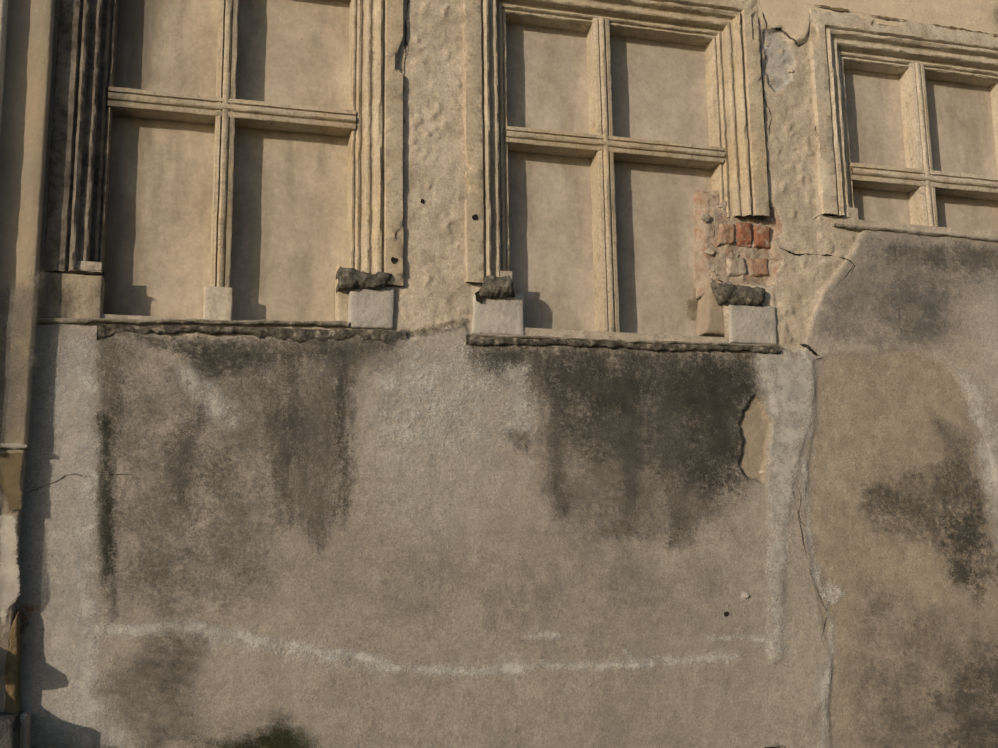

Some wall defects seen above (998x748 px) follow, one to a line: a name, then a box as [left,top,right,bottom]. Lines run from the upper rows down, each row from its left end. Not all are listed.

crack [402,0,410,91]
crack [759,4,997,176]
spalling [701,200,783,286]
peeling [0,443,27,625]
leakage [49,338,755,747]
flaking render [738,394,773,484]
crack [791,344,832,711]
leakage [800,459,834,748]
leakage [956,368,998,552]